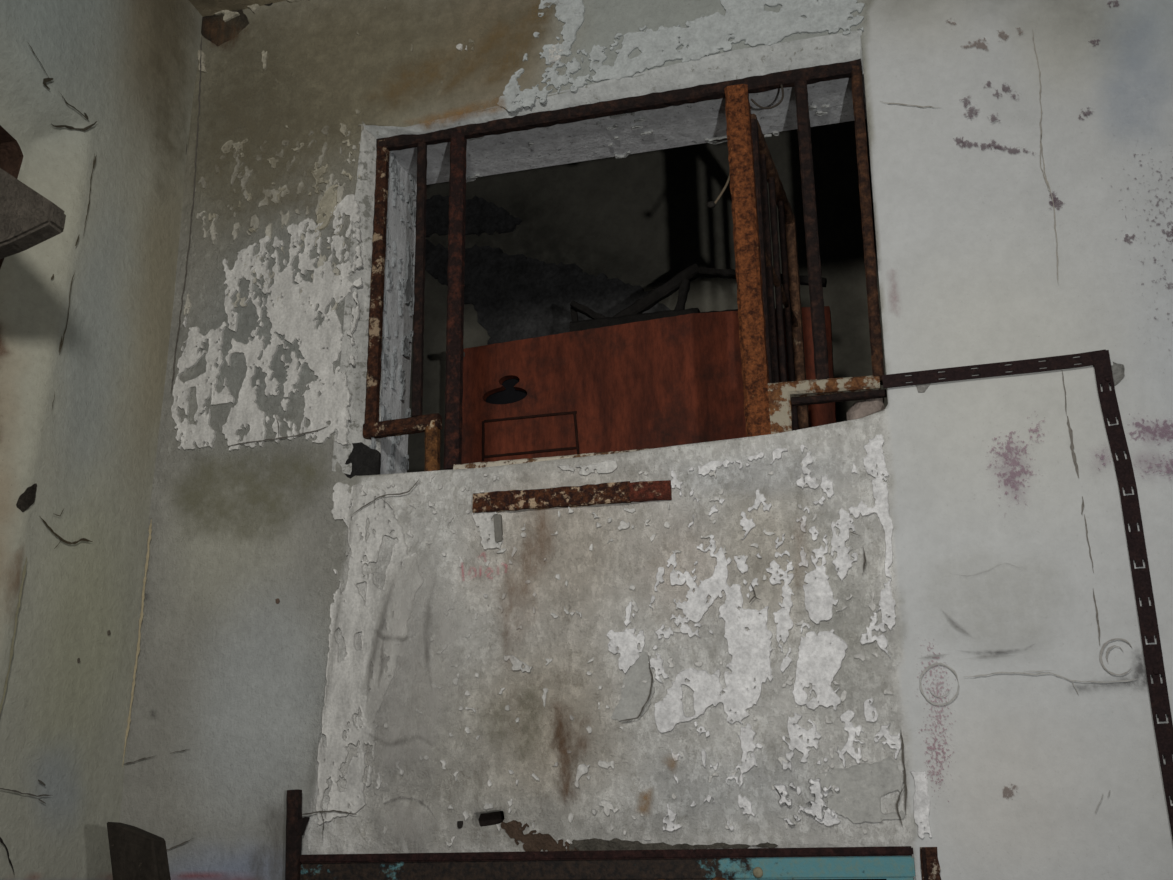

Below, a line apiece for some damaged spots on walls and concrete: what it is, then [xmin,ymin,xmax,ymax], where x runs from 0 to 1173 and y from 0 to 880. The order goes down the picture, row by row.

spalling [198,3,273,73]
peeling [497,0,865,113]
crack [28,43,97,354]
crack [1032,30,1058,280]
crack [41,509,93,549]
peeling [171,123,464,825]
peeling [409,475,527,567]
rust [472,480,672,513]
crack [1062,371,1100,644]
peeling [587,435,901,829]
spalling [496,775,778,852]
peeling [911,771,932,839]